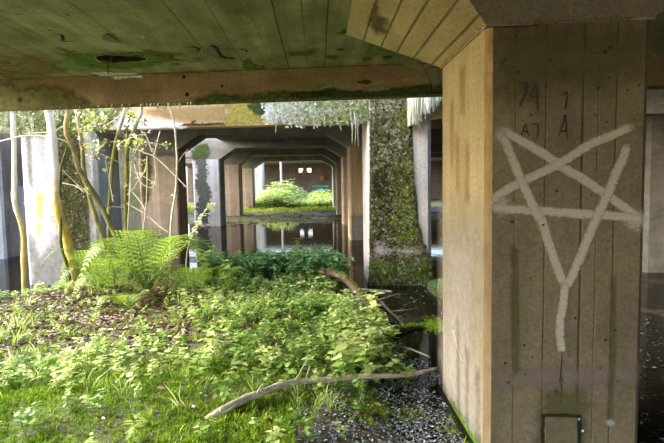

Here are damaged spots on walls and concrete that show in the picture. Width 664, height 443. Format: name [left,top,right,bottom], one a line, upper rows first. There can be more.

water stain [0,54,198,80]
spalling [95,55,146,74]
water stain [498,248,634,420]
crack [557,351,565,403]